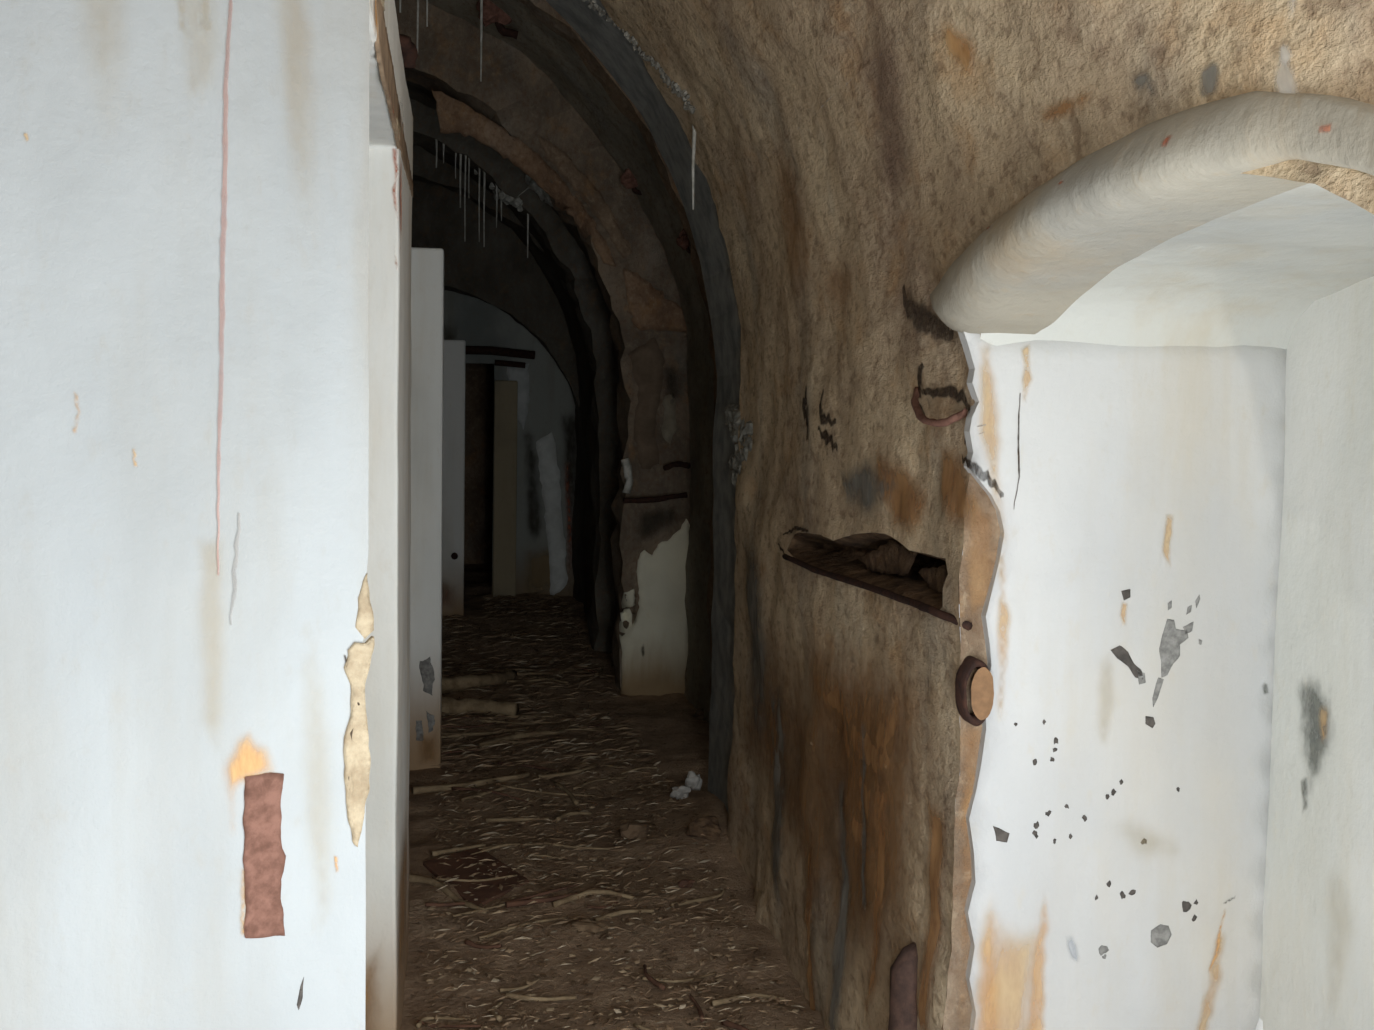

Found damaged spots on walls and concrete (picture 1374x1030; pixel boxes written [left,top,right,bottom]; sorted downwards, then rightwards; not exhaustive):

peeling [619,519,690,696]
spalling [782,532,973,631]
corrosion [230,741,266,782]
spalling [343,573,375,847]
water stain [746,557,785,890]
peeling [1111,595,1202,728]
peeling [993,826,1010,842]
peeling [1032,804,1087,844]
peeling [1151,924,1172,948]
peeling [1182,899,1198,921]